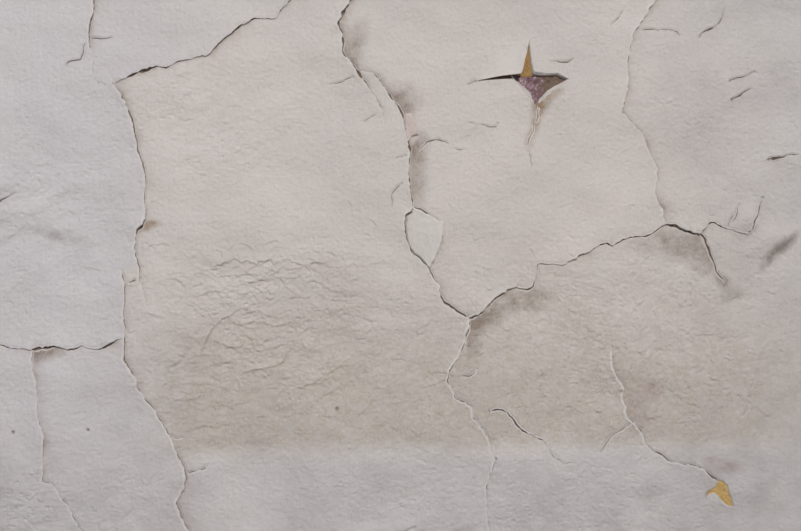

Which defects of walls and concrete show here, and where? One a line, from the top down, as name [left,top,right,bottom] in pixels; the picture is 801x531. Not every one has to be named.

flaking render [515,75,544,104]
crack [769,153,799,162]
crack [0,0,293,531]
crack [330,0,764,531]
peeling [707,481,733,507]